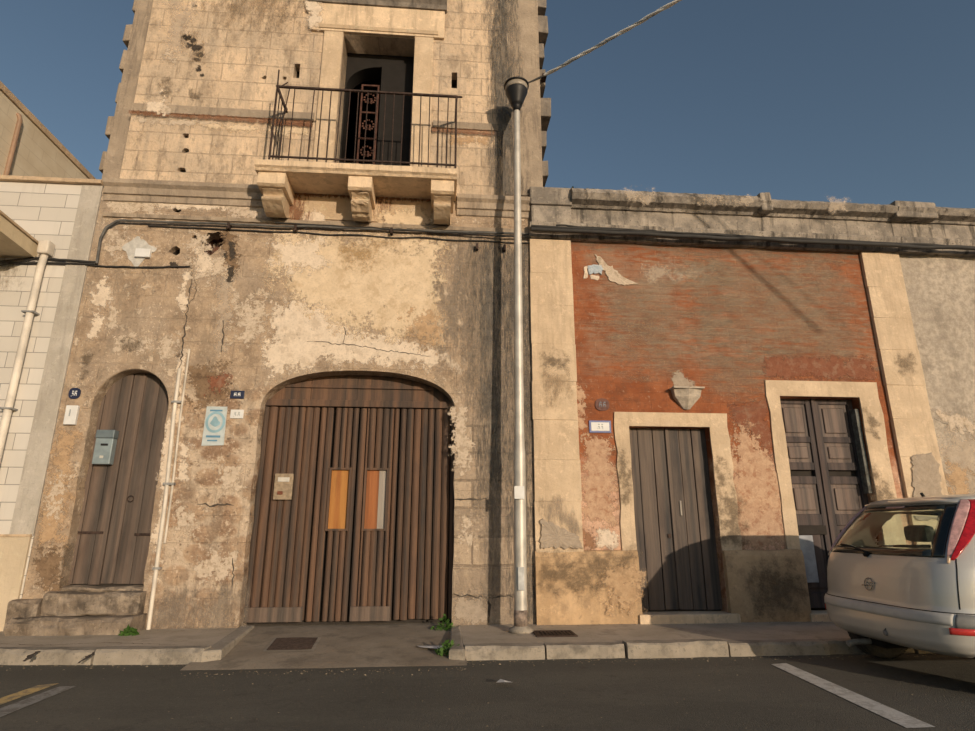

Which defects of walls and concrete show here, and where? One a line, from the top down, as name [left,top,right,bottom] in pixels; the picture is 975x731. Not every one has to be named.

leakage [484,0,522,196]
crack [175,267,197,368]
crack [307,326,429,357]
peeling [583,254,638,286]
crack [197,501,234,509]
peeling [86,201,467,584]
spalling [448,406,475,477]
leakage [439,238,634,622]
peeling [576,385,621,550]
peeling [727,398,787,550]
spalling [910,452,975,497]
spalling [454,593,491,625]